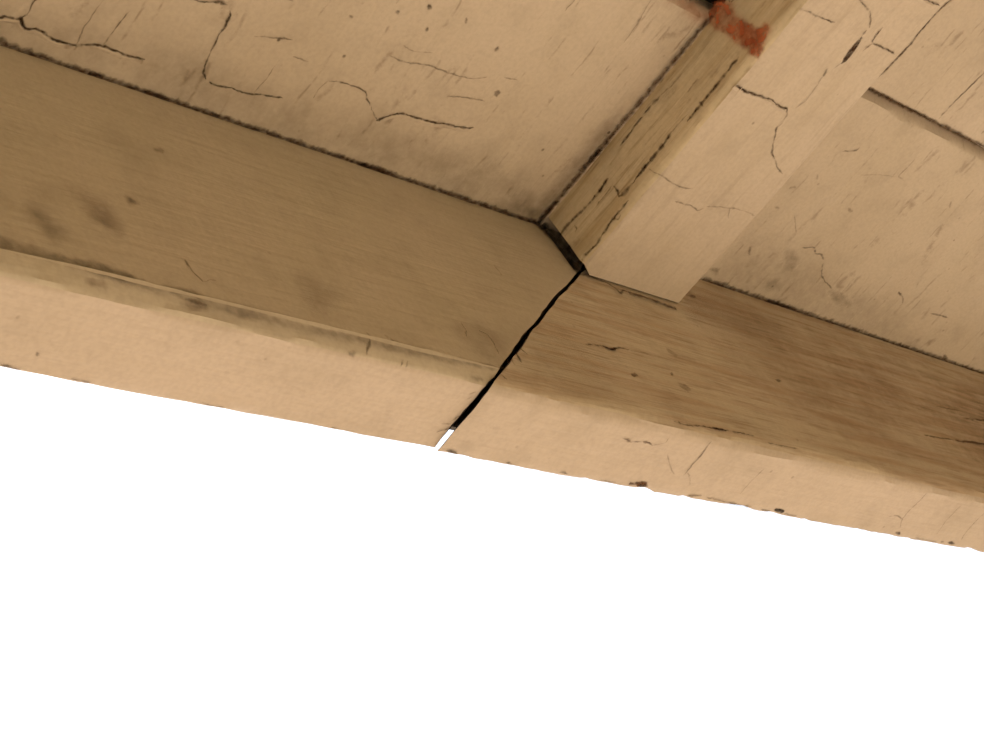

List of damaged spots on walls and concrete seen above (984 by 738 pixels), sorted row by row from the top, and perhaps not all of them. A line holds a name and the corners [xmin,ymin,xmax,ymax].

crack [0,0,144,64]
crack [196,0,282,98]
corrosion [709,2,767,57]
crack [842,0,954,75]
crack [333,81,473,132]
crack [561,60,788,256]